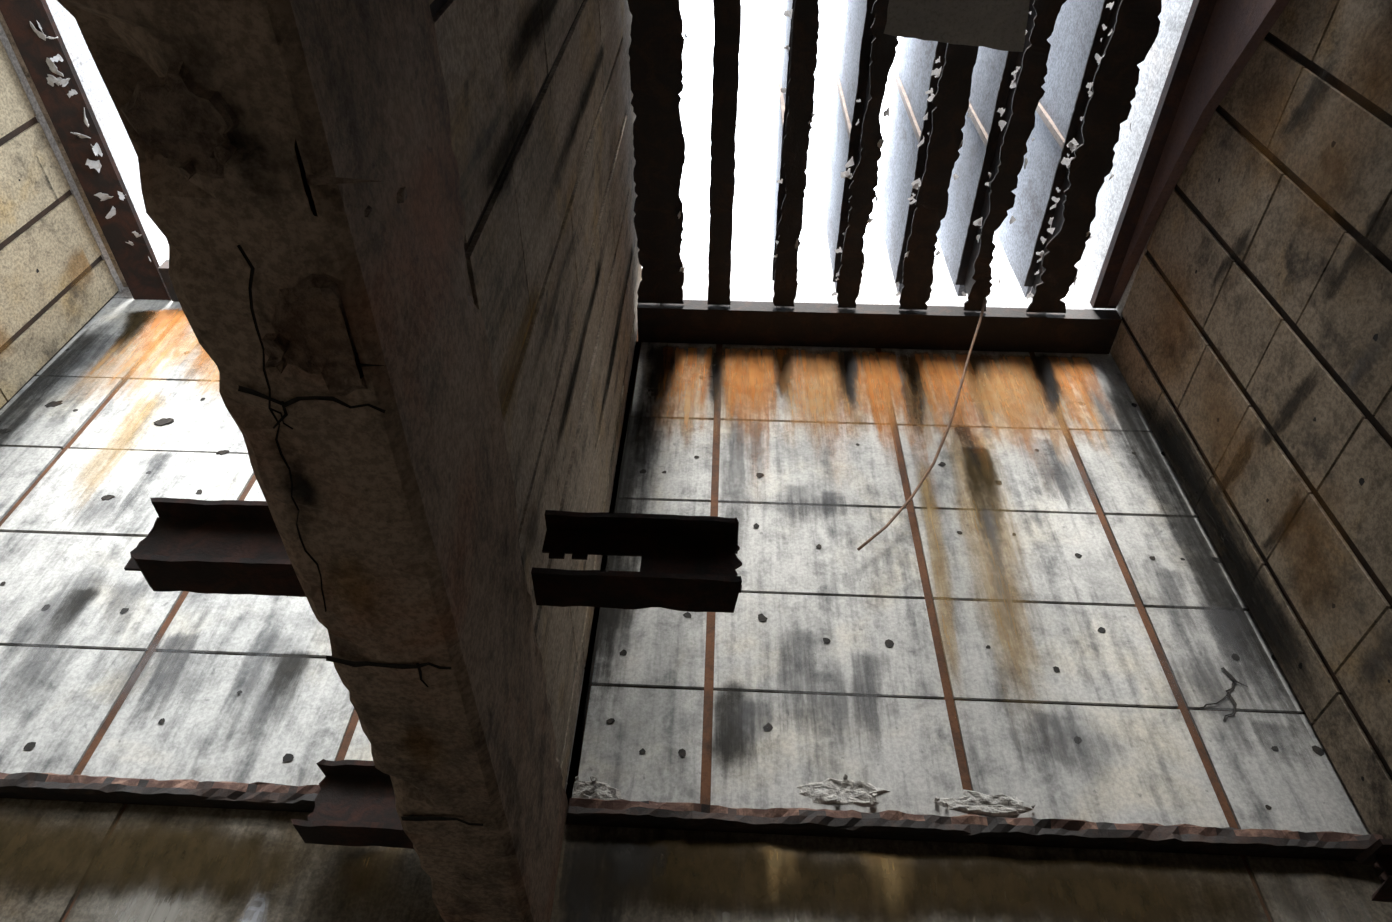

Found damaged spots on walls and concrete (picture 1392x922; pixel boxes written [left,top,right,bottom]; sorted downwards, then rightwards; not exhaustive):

leakage [1214,228,1251,284]
leakage [1324,205,1392,298]
rust [88,309,219,385]
rust [89,398,155,486]
crack [237,245,386,612]
rust [656,346,1102,673]
leakage [1045,440,1067,493]
leakage [26,577,101,679]
leakage [127,636,195,689]
leakage [244,634,310,725]
leakage [712,683,755,767]